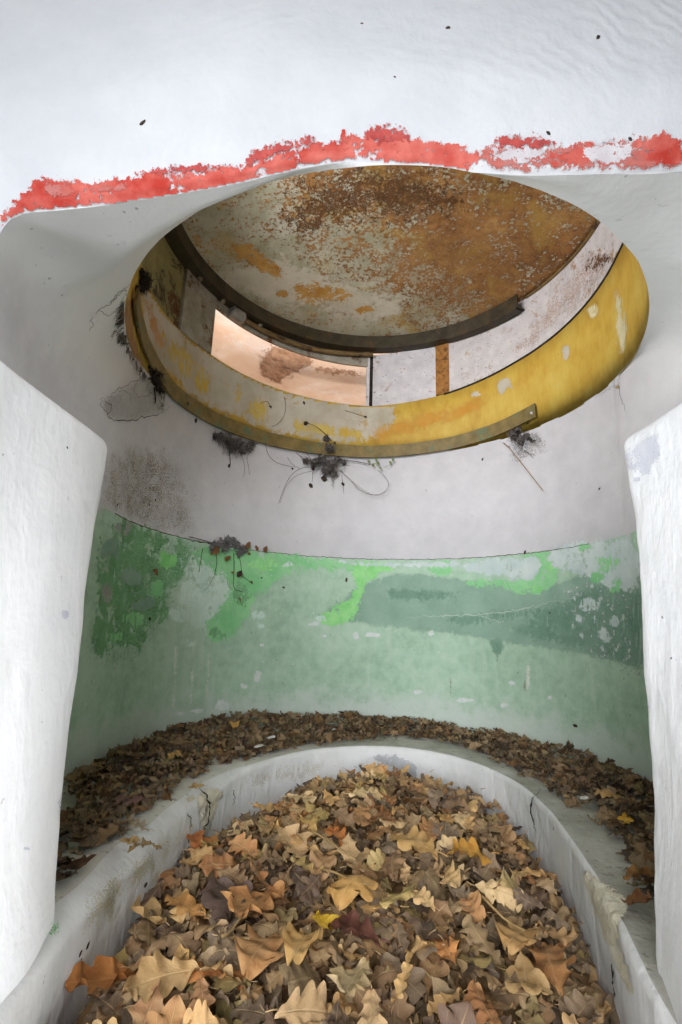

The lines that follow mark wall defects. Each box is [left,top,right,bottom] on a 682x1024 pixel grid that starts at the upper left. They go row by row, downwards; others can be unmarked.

peeling [0,123,682,226]
corrosion [272,165,462,249]
corrosion [230,242,374,315]
corrosion [516,247,613,349]
peeling [90,517,644,675]
spalling [583,870,634,995]